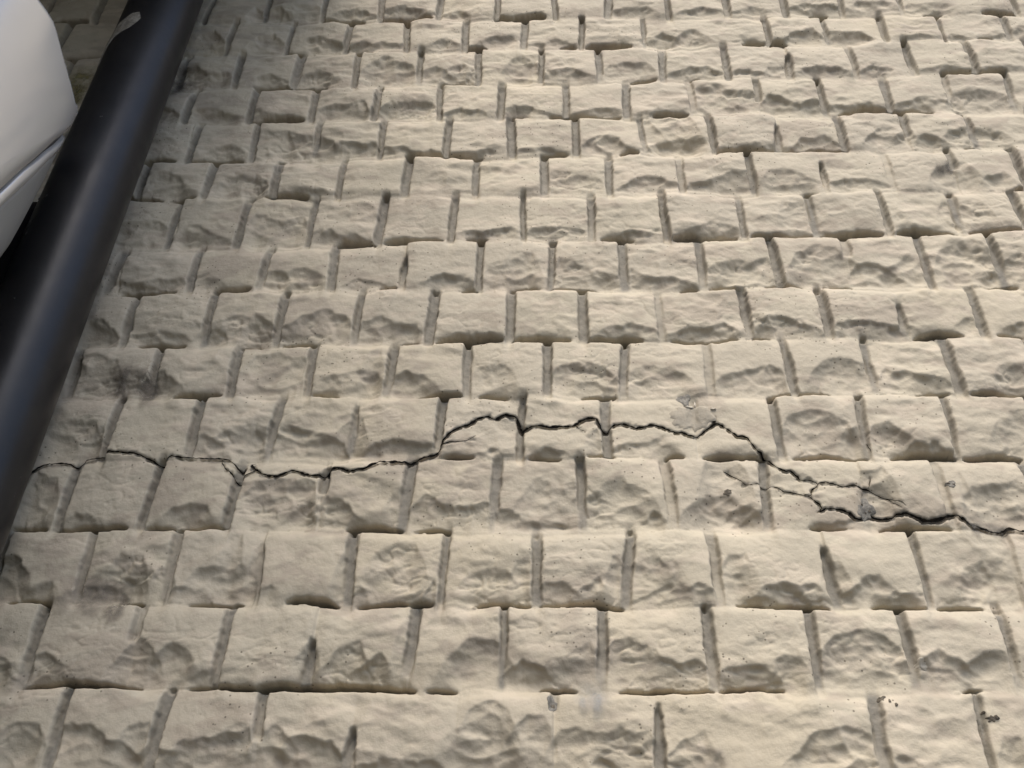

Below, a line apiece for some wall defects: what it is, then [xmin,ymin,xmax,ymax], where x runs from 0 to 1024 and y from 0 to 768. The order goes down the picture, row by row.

crack [32,414,1024,535]